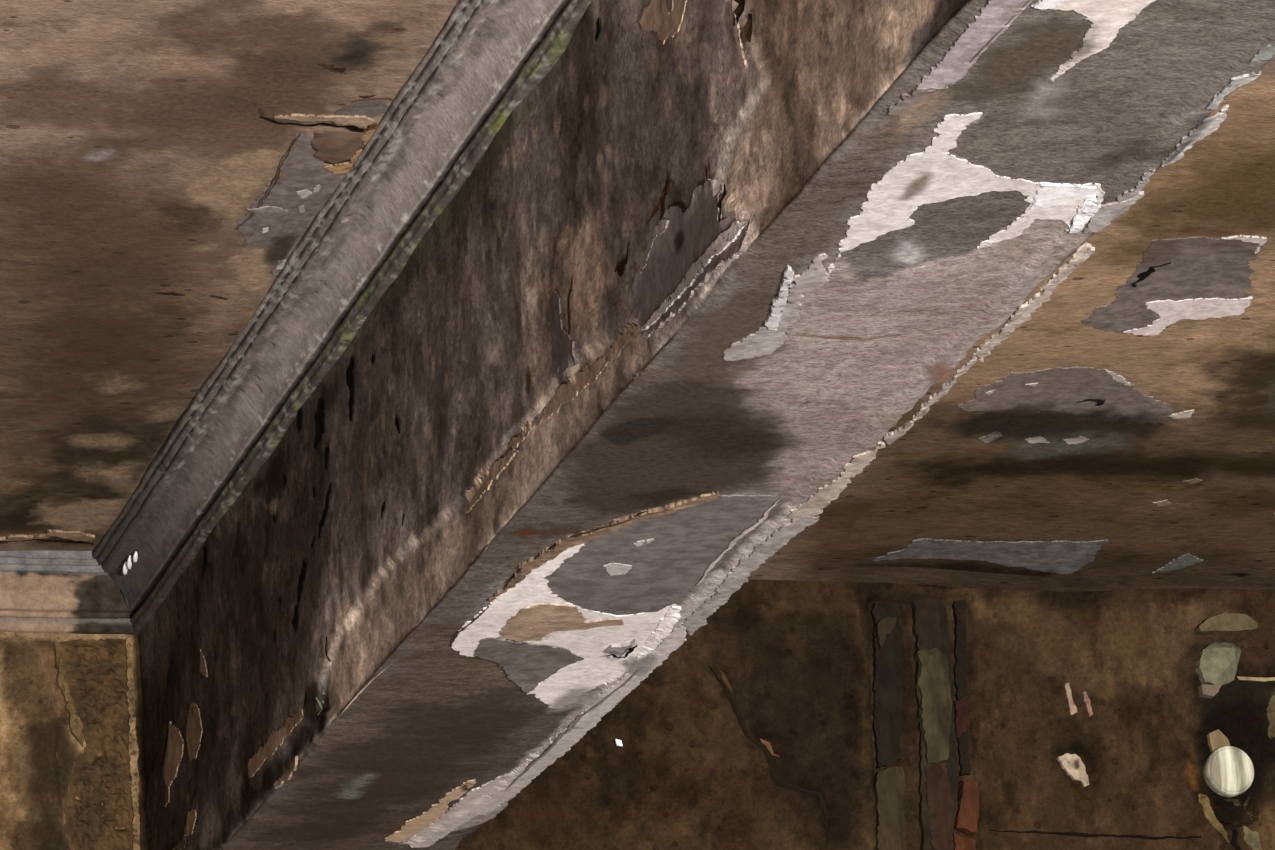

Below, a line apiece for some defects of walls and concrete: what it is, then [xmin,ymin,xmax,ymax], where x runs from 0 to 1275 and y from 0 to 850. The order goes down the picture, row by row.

water stain [0,0,375,155]
peeling [183,132,347,293]
water stain [37,327,170,480]
water stain [571,296,788,512]
peeling [385,0,1275,848]
water stain [0,478,120,532]
flaking render [29,637,140,850]
flaking render [161,702,203,807]
water stain [221,683,330,846]
flaking render [248,708,304,778]
flaking render [273,756,298,789]
water stain [286,691,546,840]